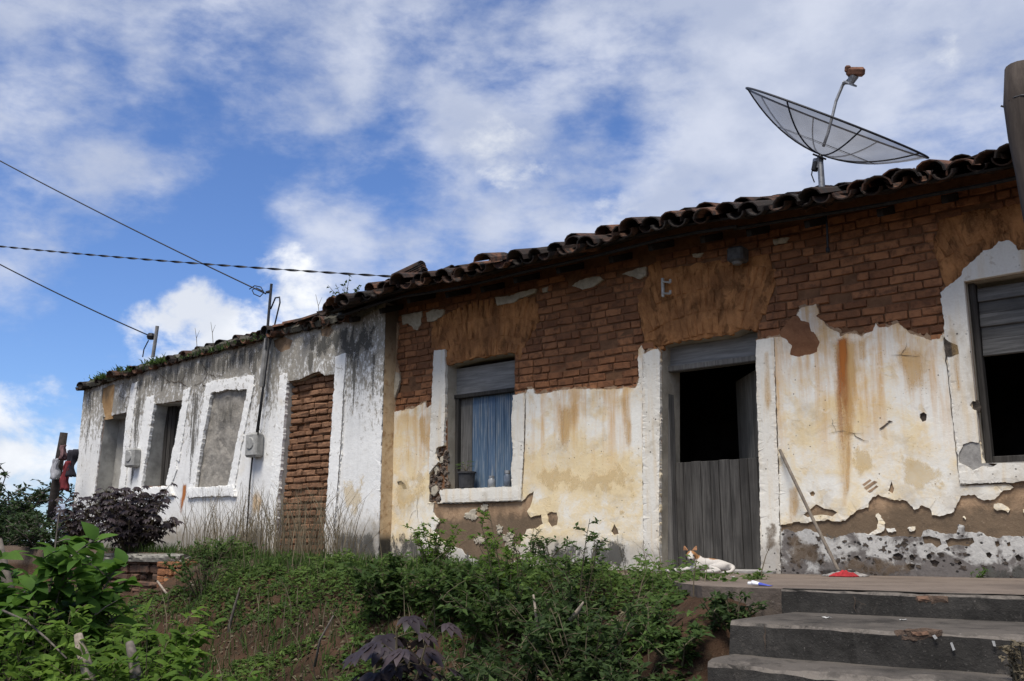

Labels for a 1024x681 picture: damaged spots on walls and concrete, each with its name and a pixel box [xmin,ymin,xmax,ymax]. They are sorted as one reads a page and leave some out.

spalling [394,180,1020,412]
damp [123,346,262,474]
damp [304,322,375,406]
peeling [429,421,558,564]
corrosion [836,339,864,438]
peeling [781,479,1024,577]
peeling [956,440,994,470]